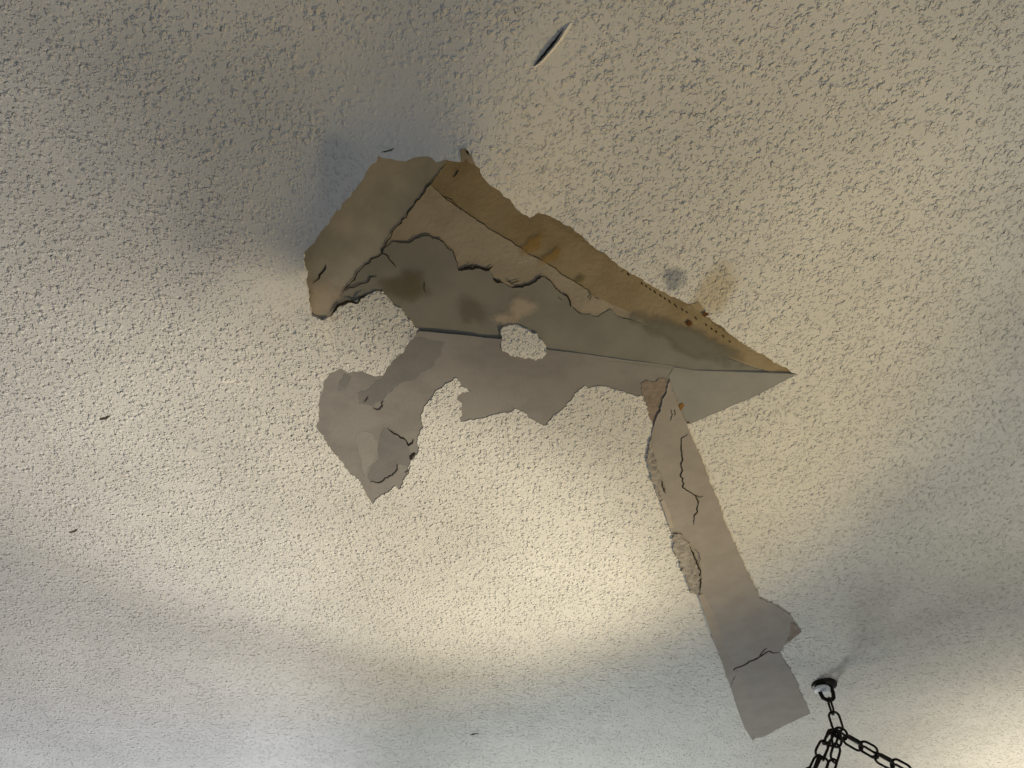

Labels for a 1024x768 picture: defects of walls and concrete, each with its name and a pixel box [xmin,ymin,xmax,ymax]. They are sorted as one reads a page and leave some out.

crack [534,23,572,68]
crack [364,398,416,483]
peeling [316,324,810,740]
crack [661,411,703,592]
crack [733,648,779,679]